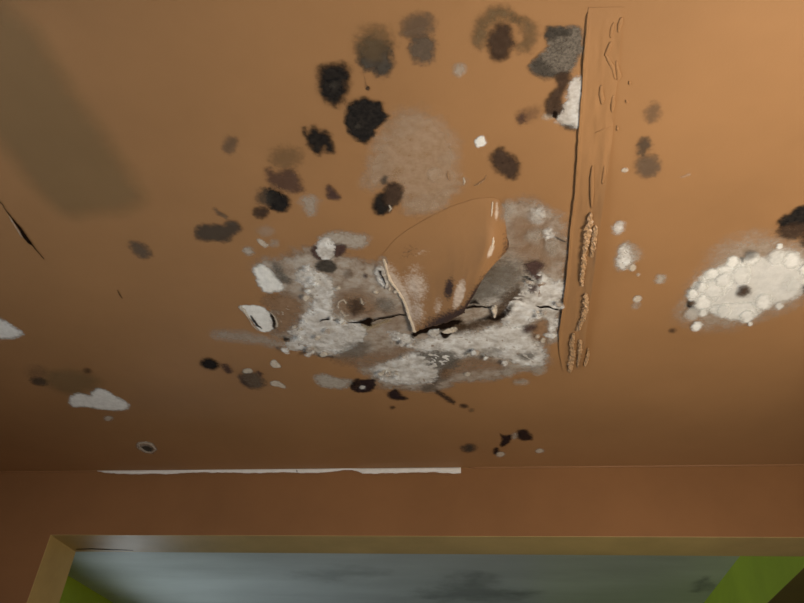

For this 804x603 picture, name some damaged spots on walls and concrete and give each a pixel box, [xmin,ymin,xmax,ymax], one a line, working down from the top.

mould [529,25,583,118]
mould [319,64,389,143]
damp [253,170,315,219]
mould [372,177,403,215]
crack [0,202,44,259]
peeling [0,320,23,339]
crack [320,314,405,327]
flaking render [239,200,568,392]
spalling [567,212,598,373]
damp [688,206,804,331]
peeling [69,388,129,421]
peeling [99,467,461,476]